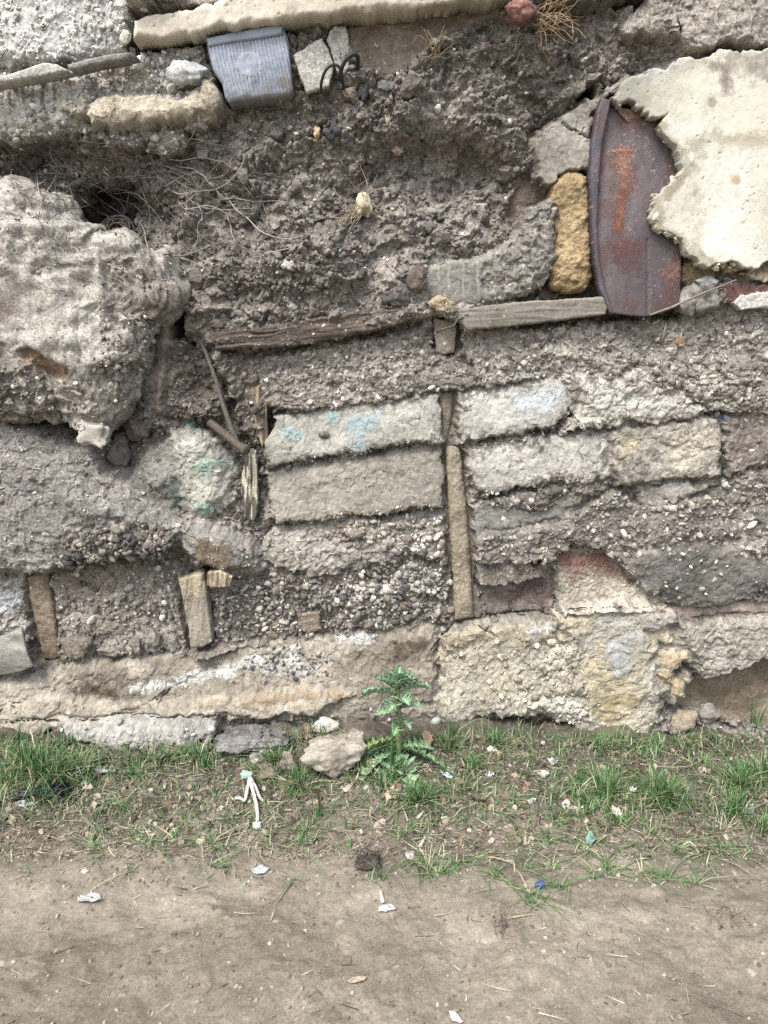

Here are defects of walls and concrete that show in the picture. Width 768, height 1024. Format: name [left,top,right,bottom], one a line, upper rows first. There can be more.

corrosion [586,98,682,317]